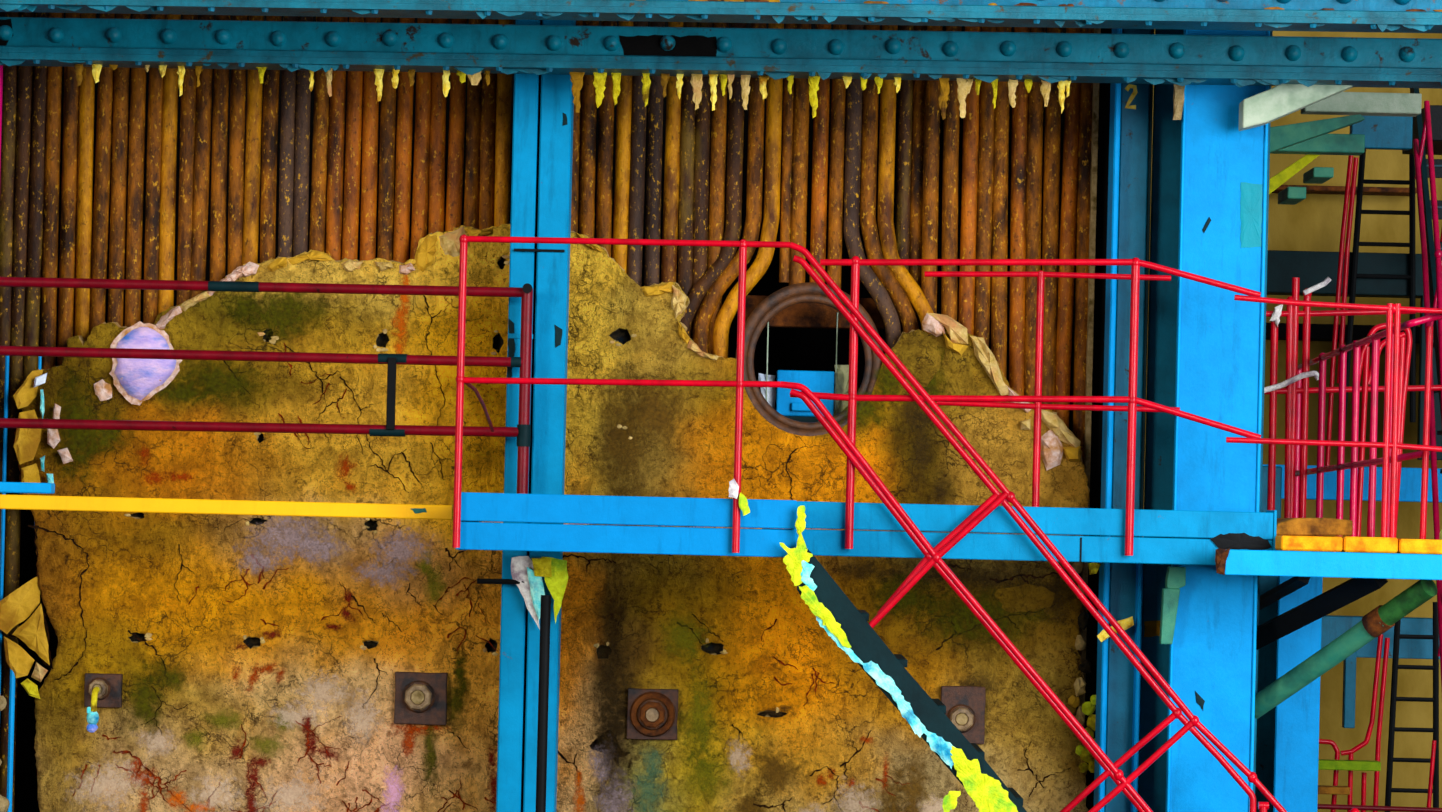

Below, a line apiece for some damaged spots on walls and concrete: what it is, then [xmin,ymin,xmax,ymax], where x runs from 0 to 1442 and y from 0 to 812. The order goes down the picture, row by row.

peeling [641,72,901,118]
peeling [928,75,1071,120]
spalling [94,226,493,405]
spalling [922,313,1081,471]
crack [8,525,90,680]
crack [321,548,498,652]
corrosion [233,663,286,691]
crack [73,630,391,812]
corrosion [230,741,271,812]
corrosion [302,717,339,760]
corrosion [392,723,448,756]
crack [753,730,907,812]